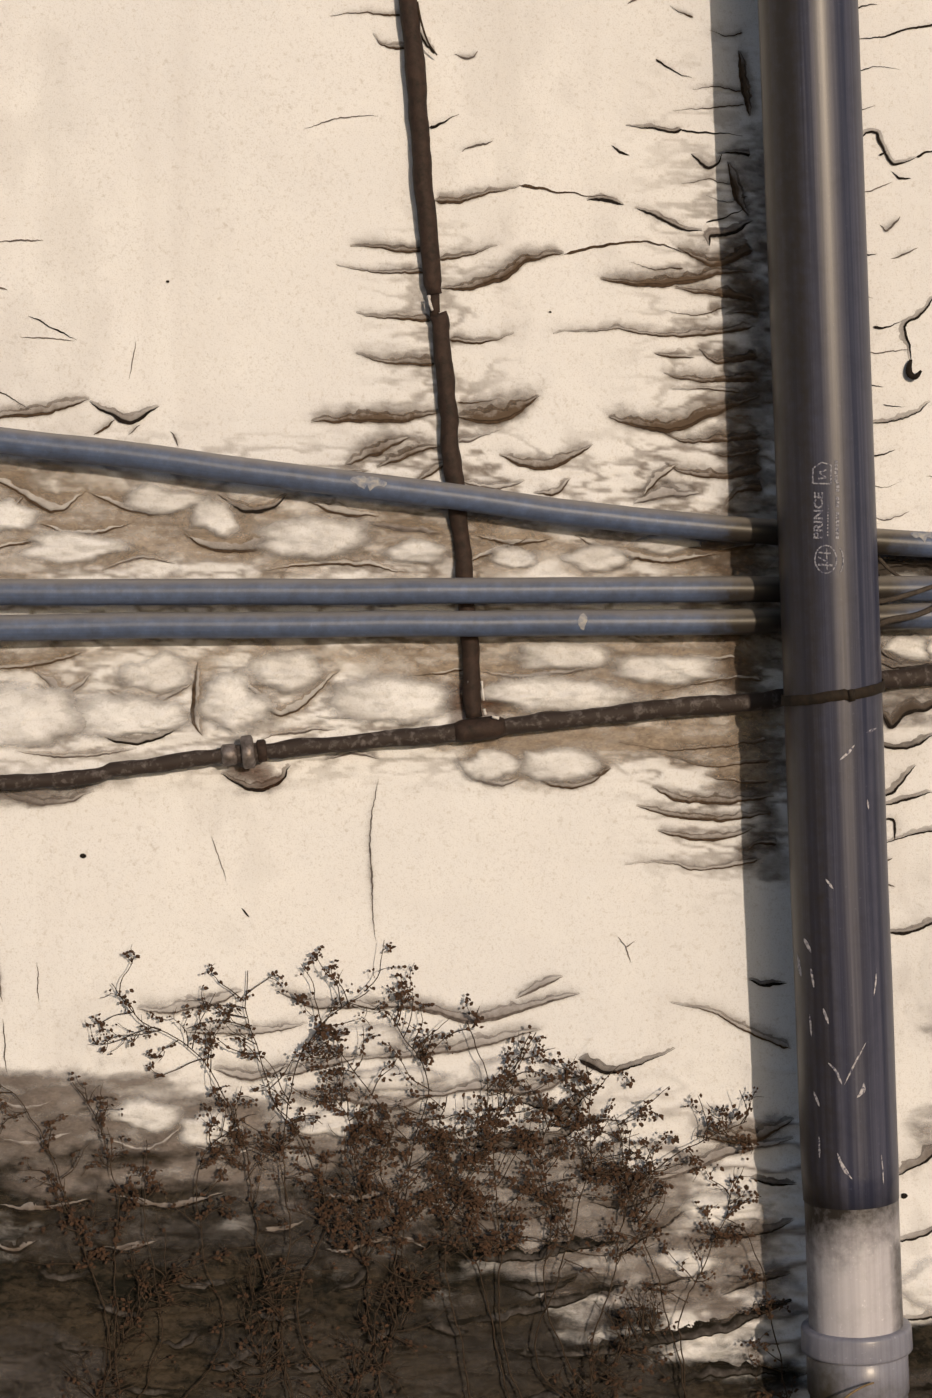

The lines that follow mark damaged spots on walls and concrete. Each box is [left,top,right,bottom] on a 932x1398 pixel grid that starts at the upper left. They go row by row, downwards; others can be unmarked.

crack [333,9,400,17]
crack [858,4,932,71]
crack [865,172,910,192]
crack [867,217,917,259]
peeling [435,123,763,504]
peeling [311,409,443,479]
crack [874,450,932,521]
peeling [883,697,932,805]
peeling [619,733,777,871]
peeling [186,974,675,1150]
damp [0,1071,805,1398]
damp [908,1323,932,1398]